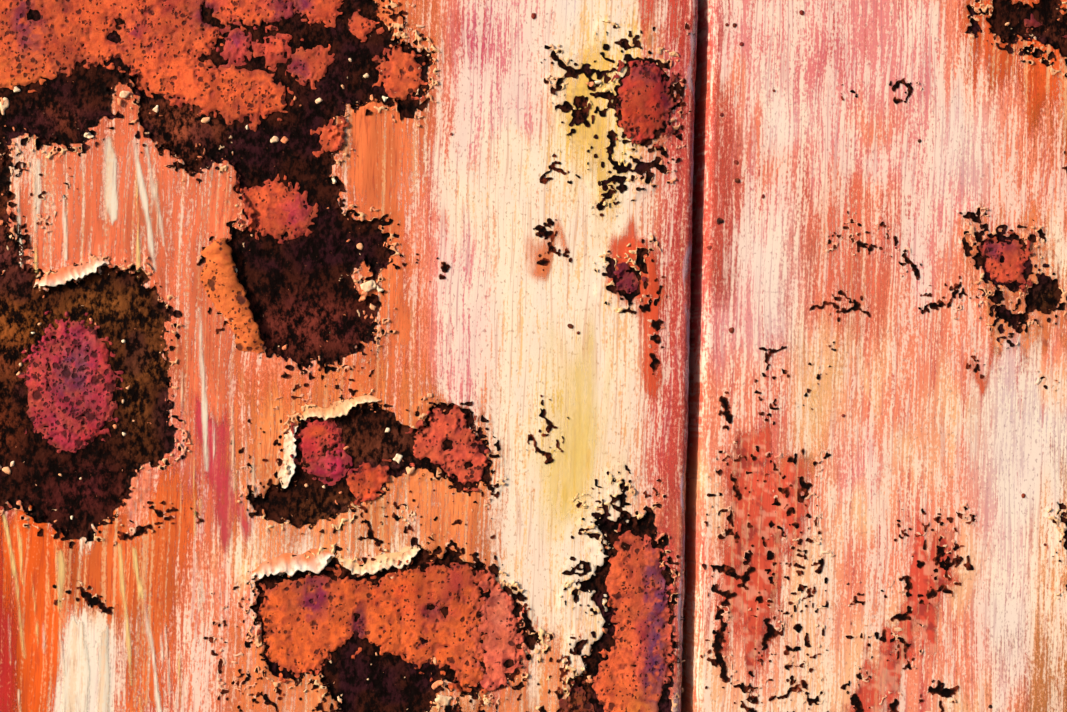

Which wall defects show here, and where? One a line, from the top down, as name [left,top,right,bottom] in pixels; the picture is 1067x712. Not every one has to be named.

corrosion [0,0,696,712]
corrosion [702,81,741,306]
corrosion [959,0,1067,164]
corrosion [959,206,1067,394]
corrosion [716,420,814,678]
corrosion [846,519,958,712]